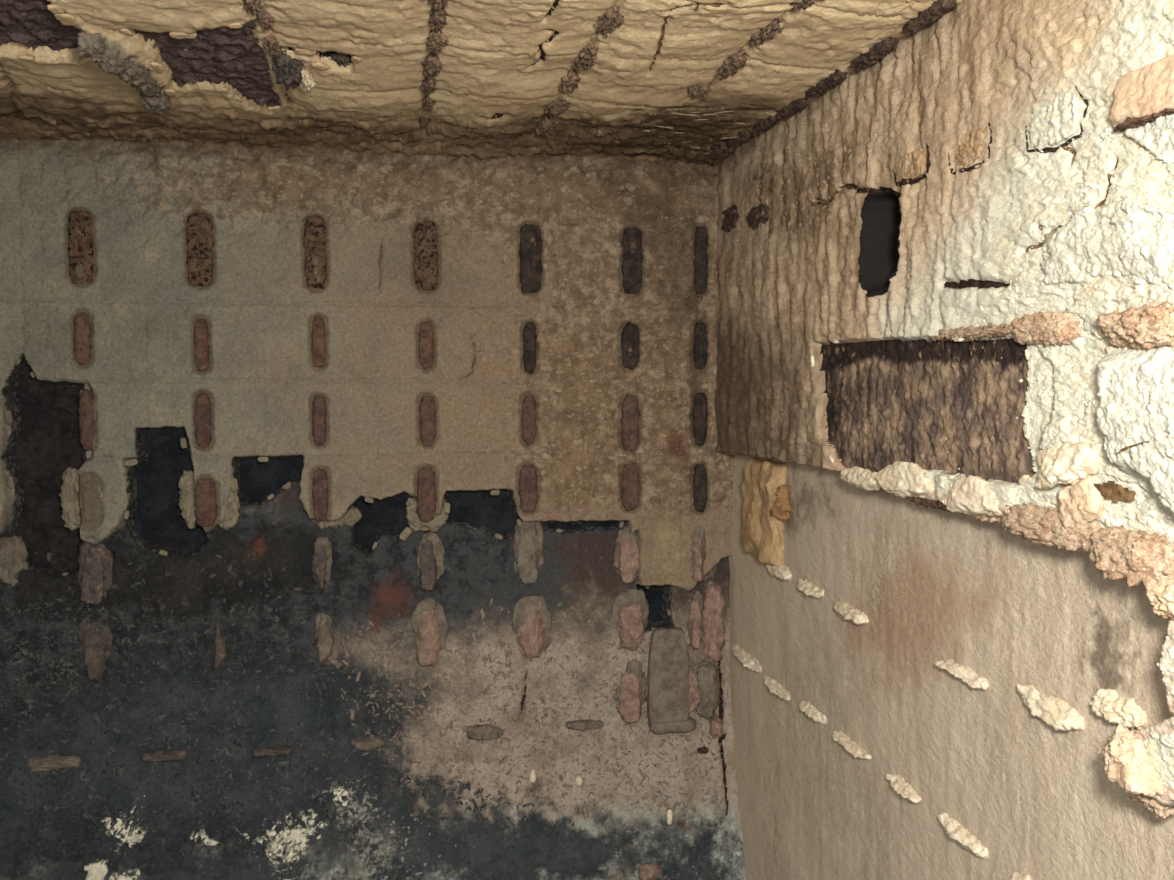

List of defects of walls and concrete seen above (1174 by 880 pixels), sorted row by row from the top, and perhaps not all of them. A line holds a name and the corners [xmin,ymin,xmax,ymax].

spalling [0,0,95,65]
spalling [119,19,281,110]
crack [531,0,559,65]
crack [812,122,992,206]
crack [1025,86,1089,166]
crack [1094,159,1118,209]
spalling [810,337,1136,531]
spalling [124,429,208,556]
damp [84,808,146,880]
damp [190,830,219,850]
damp [236,778,417,880]
damp [449,818,613,880]